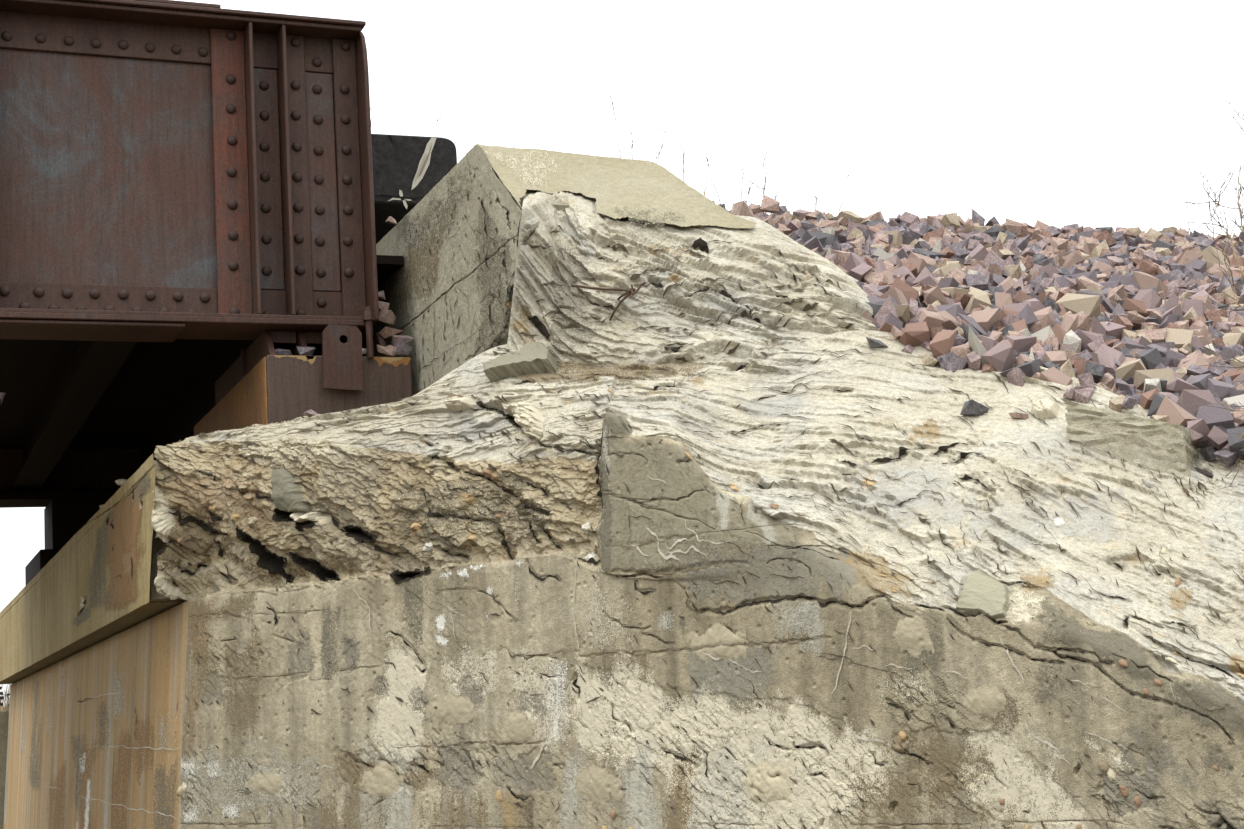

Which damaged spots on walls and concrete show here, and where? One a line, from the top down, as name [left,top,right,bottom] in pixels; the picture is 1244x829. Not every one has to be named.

crack [403,179,514,384]
rust [273,355,316,364]
rust [369,357,411,367]
spalling [184,192,1244,708]
crack [404,436,1241,744]
damp [385,468,591,829]
damp [290,728,534,829]
crack [508,742,562,801]
damp [618,731,772,829]
crack [663,747,735,778]
crack [1025,721,1079,769]